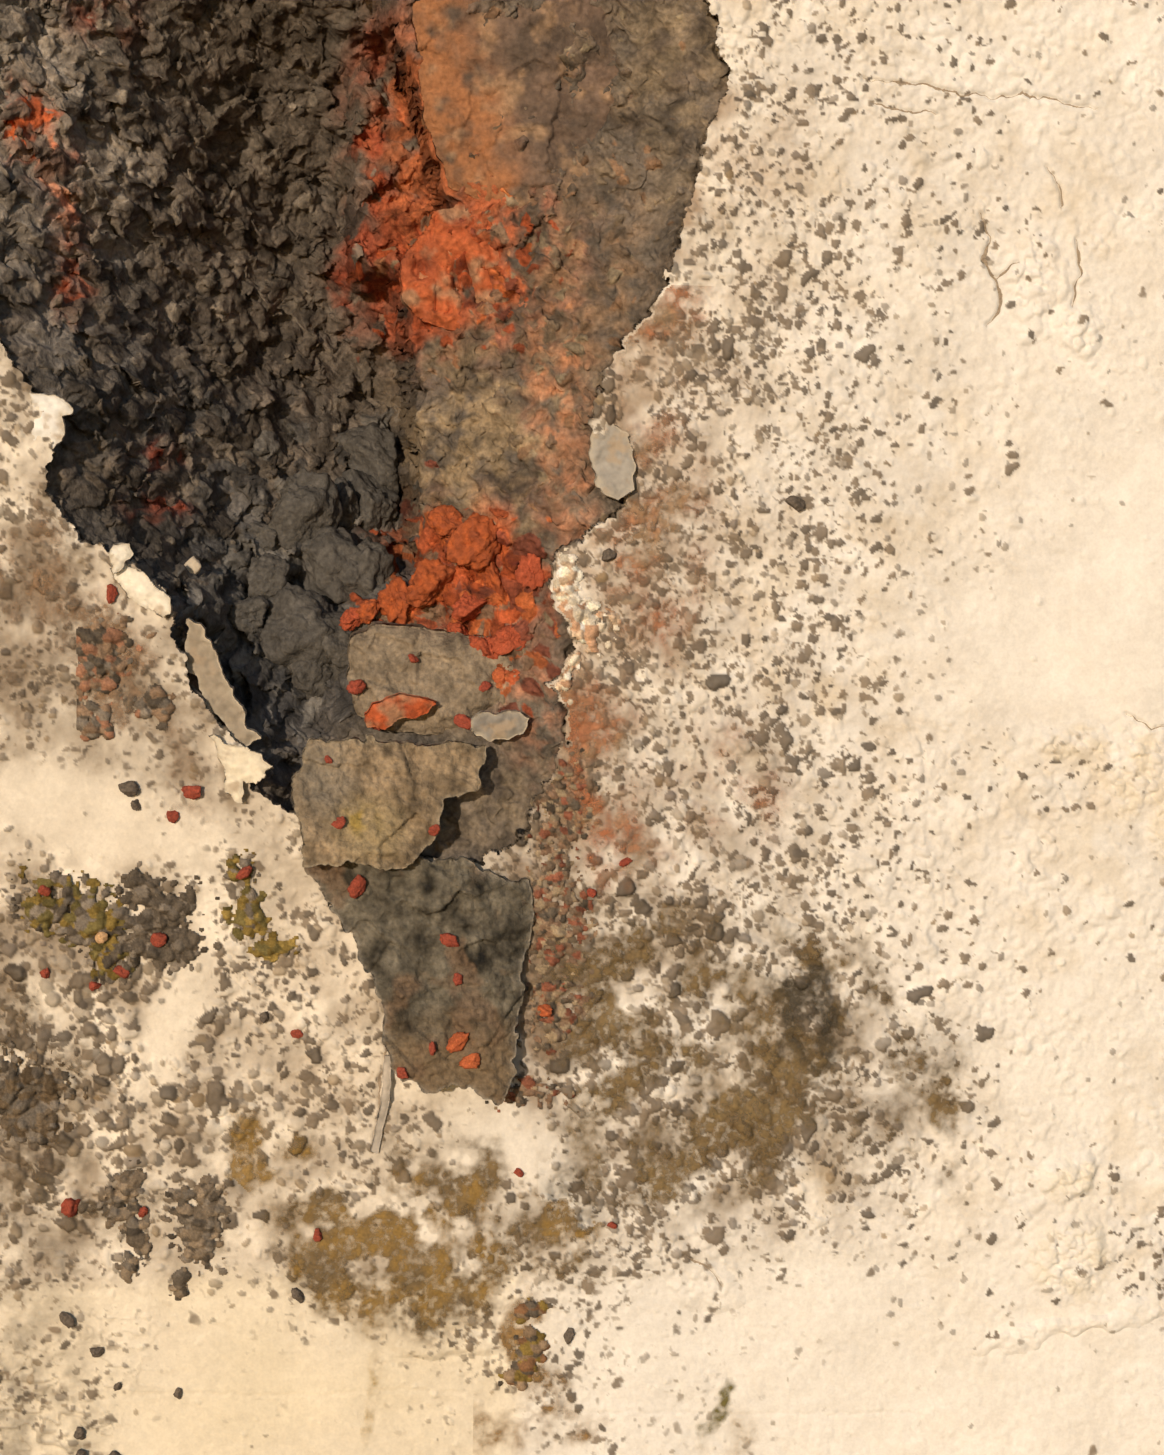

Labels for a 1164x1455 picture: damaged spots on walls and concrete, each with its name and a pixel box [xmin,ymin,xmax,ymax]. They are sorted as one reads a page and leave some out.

spalling [0,0,731,1154]
leakage [552,914,714,1188]
leakage [628,938,848,1205]
leakage [866,966,893,1004]
leakage [886,1049,959,1128]
leakage [500,1303,541,1361]